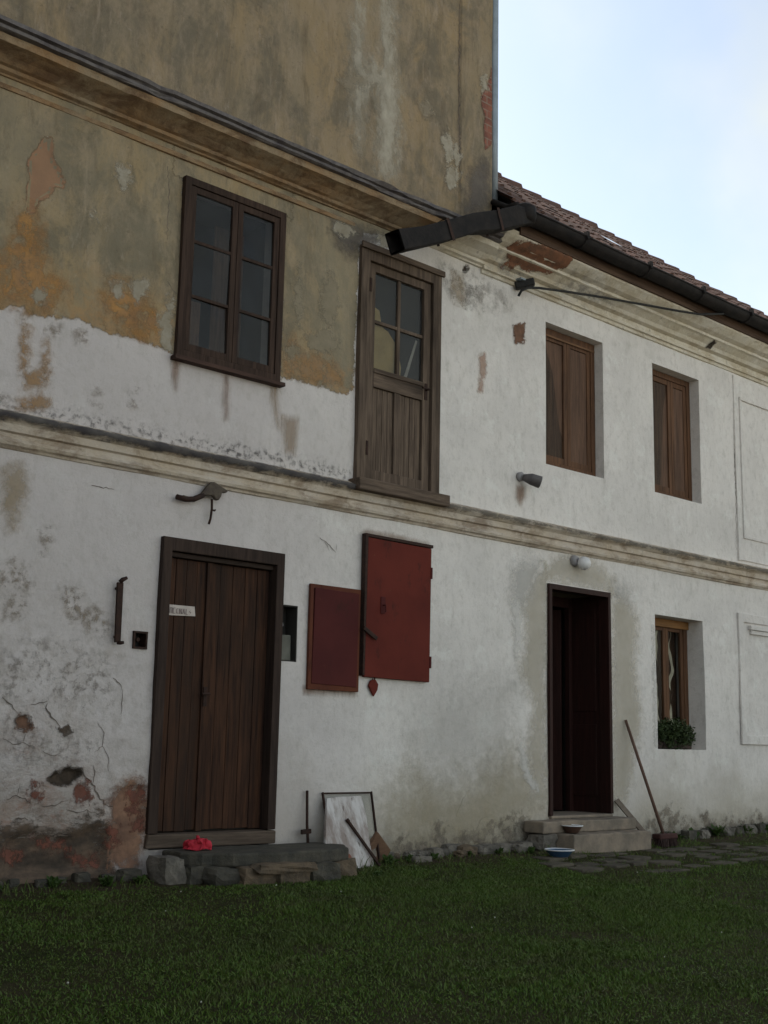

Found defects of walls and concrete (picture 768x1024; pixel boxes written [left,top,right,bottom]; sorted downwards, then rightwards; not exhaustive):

leakage [353,0,400,175]
spalling [480,68,492,150]
peeling [440,128,463,191]
flaking render [0,75,391,395]
spalling [500,240,573,275]
spalling [513,322,525,344]
flaking render [14,712,35,745]
crack [2,697,61,756]
crack [7,724,113,820]
spalling [0,764,148,885]